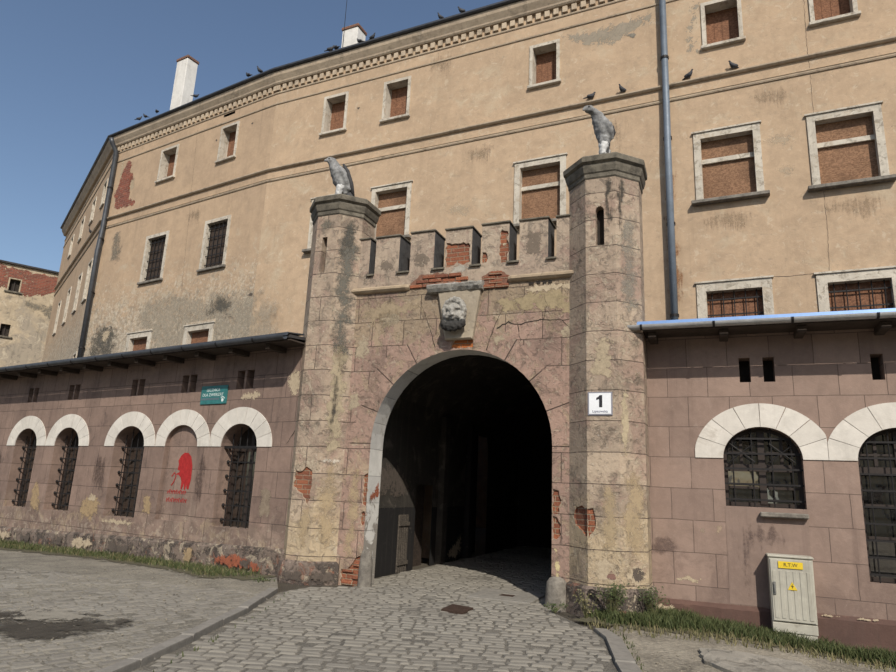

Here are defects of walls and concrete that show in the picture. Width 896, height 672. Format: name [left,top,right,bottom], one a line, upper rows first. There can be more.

flaking render [114,158,135,209]
flaking render [0,263,58,297]
damp [332,223,359,352]
flaking render [410,243,470,289]
peeling [482,229,570,339]
damp [87,325,117,356]
flaking render [452,340,473,348]
crack [486,297,570,350]
flaking render [294,467,312,503]
flaking render [341,469,380,586]
flaking render [552,489,562,577]
flaking render [576,506,596,536]